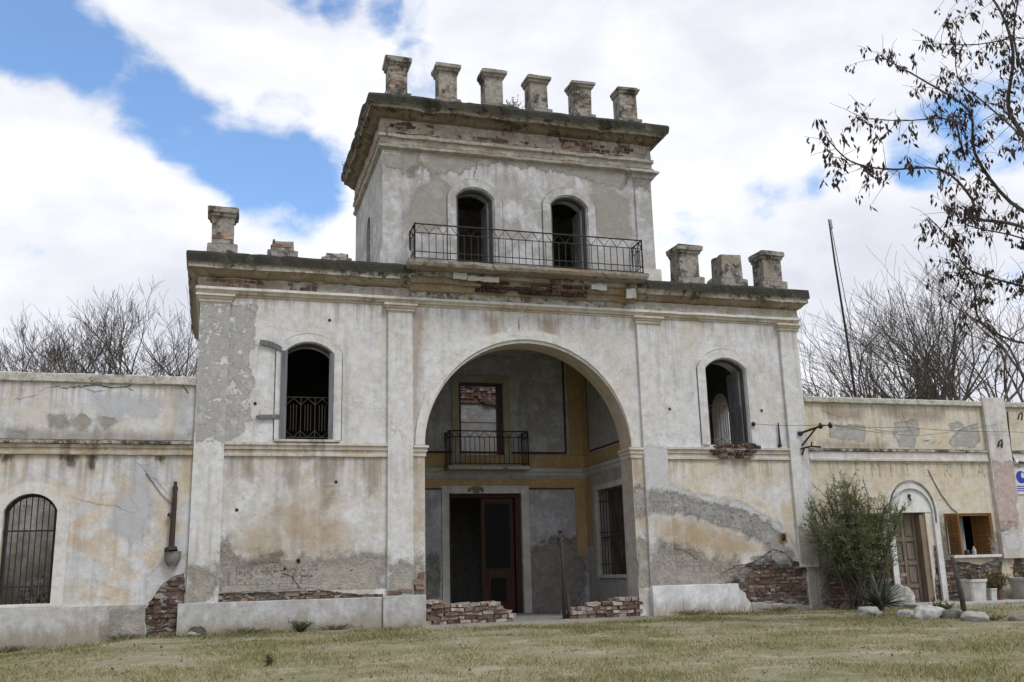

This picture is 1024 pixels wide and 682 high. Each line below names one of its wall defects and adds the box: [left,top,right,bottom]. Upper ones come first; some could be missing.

flaking render [388,122,439,138]
flaking render [470,136,539,148]
flaking render [559,138,643,157]
flaking render [453,272,607,298]
flaking render [194,303,259,443]
crack [16,384,134,399]
peeling [830,424,866,442]
flaking render [634,443,907,609]
flaking render [531,535,586,613]
flaking render [101,536,441,640]